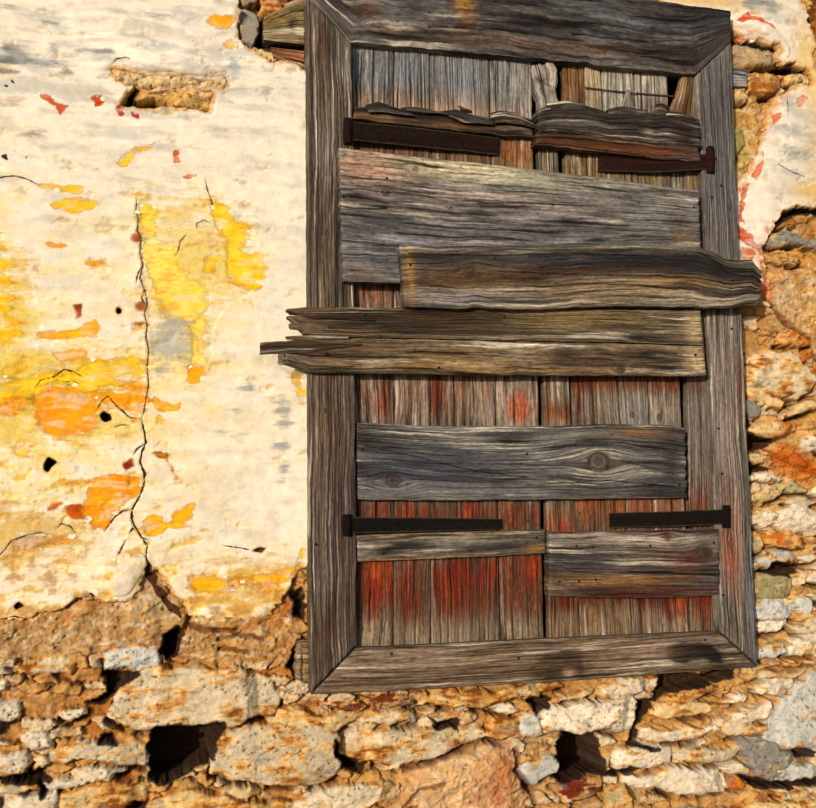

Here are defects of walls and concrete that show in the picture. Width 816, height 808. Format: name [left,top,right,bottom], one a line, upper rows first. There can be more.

spalling [207,0,305,63]
peeling [737,12,775,28]
spalling [801,0,816,24]
spalling [111,69,226,118]
spalling [728,36,816,181]
peeling [117,141,153,167]
spalling [0,184,816,808]